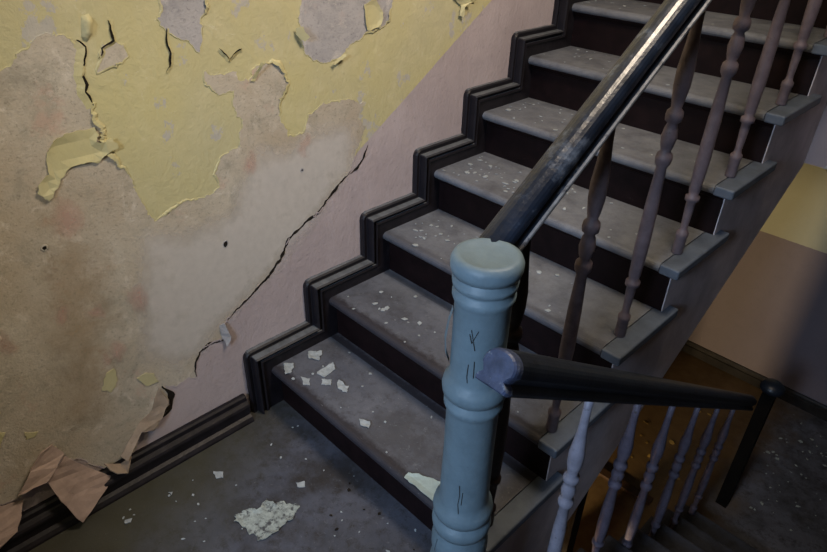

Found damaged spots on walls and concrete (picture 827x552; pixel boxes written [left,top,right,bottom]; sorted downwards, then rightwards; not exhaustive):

peeling [157,0,209,53]
peeling [296,0,393,65]
peeling [0,32,366,506]
water stain [145,131,350,358]
crack [194,145,368,377]
peeling [443,156,521,193]